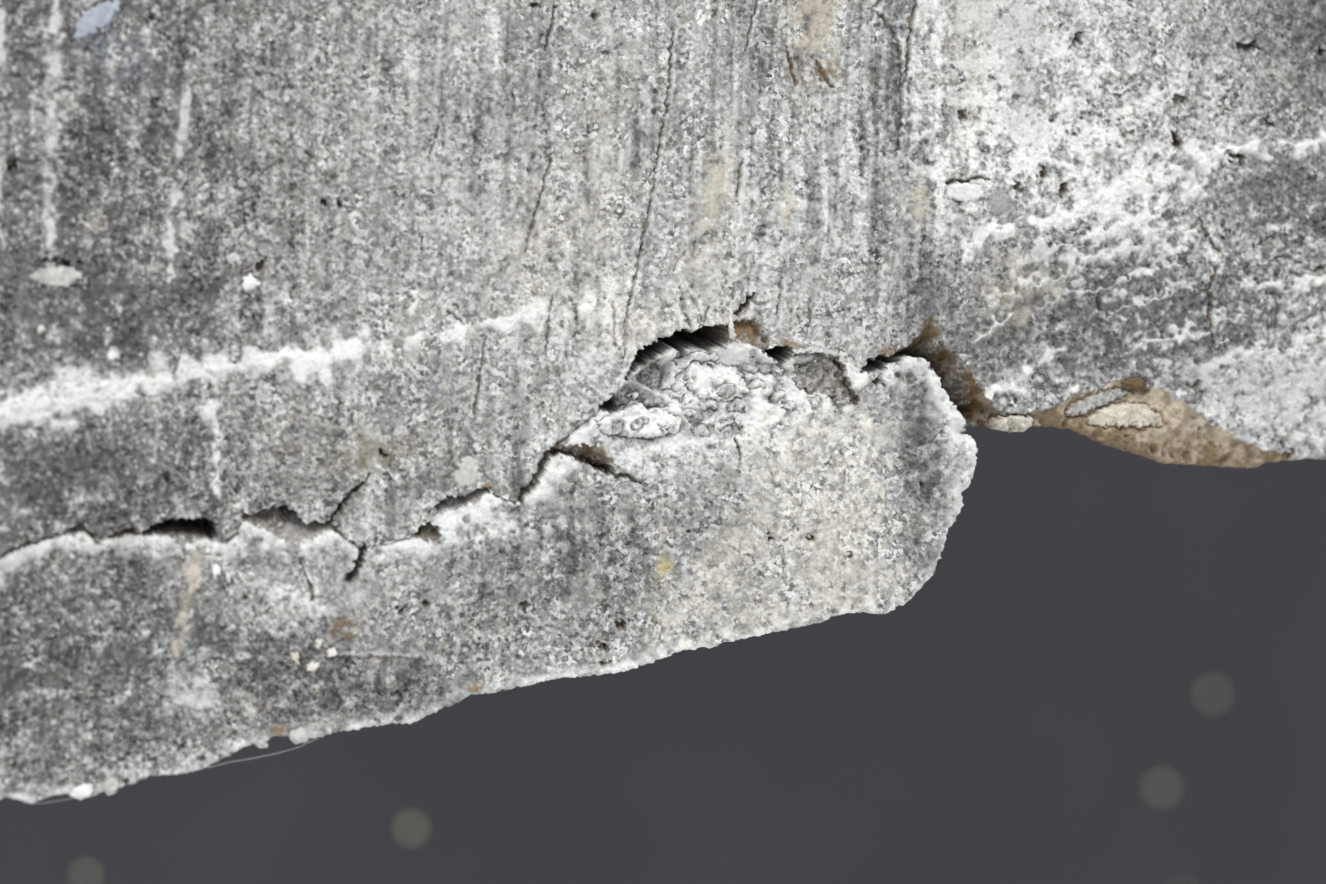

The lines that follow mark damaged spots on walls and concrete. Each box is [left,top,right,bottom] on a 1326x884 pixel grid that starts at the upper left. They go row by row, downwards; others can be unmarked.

crack [0,33,794,603]
spalling [0,344,978,804]
crack [860,317,1004,431]
spalling [984,377,1296,468]